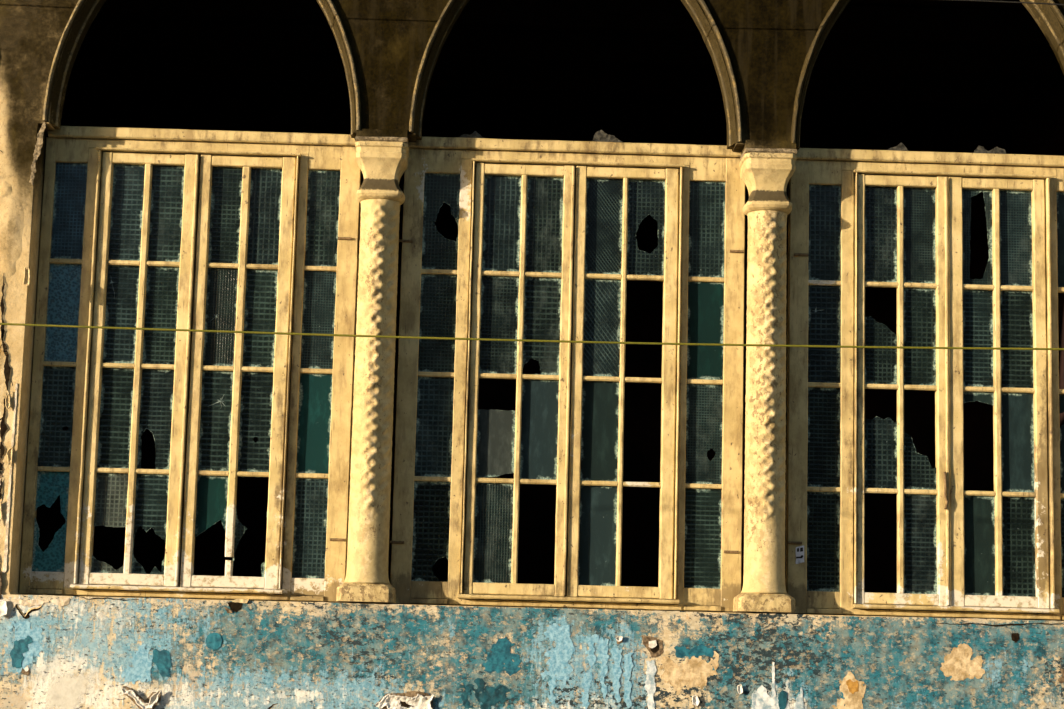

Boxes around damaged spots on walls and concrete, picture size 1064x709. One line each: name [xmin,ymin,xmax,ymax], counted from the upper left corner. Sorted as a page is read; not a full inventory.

crack [0,273,13,462]
spalling [224,598,249,613]
peeling [121,644,172,709]
peeling [205,633,222,650]
peeling [375,691,434,709]
peeling [460,637,521,709]
peeling [540,623,633,709]
peeling [642,635,719,708]
peeling [737,662,804,709]
peeling [940,644,985,681]